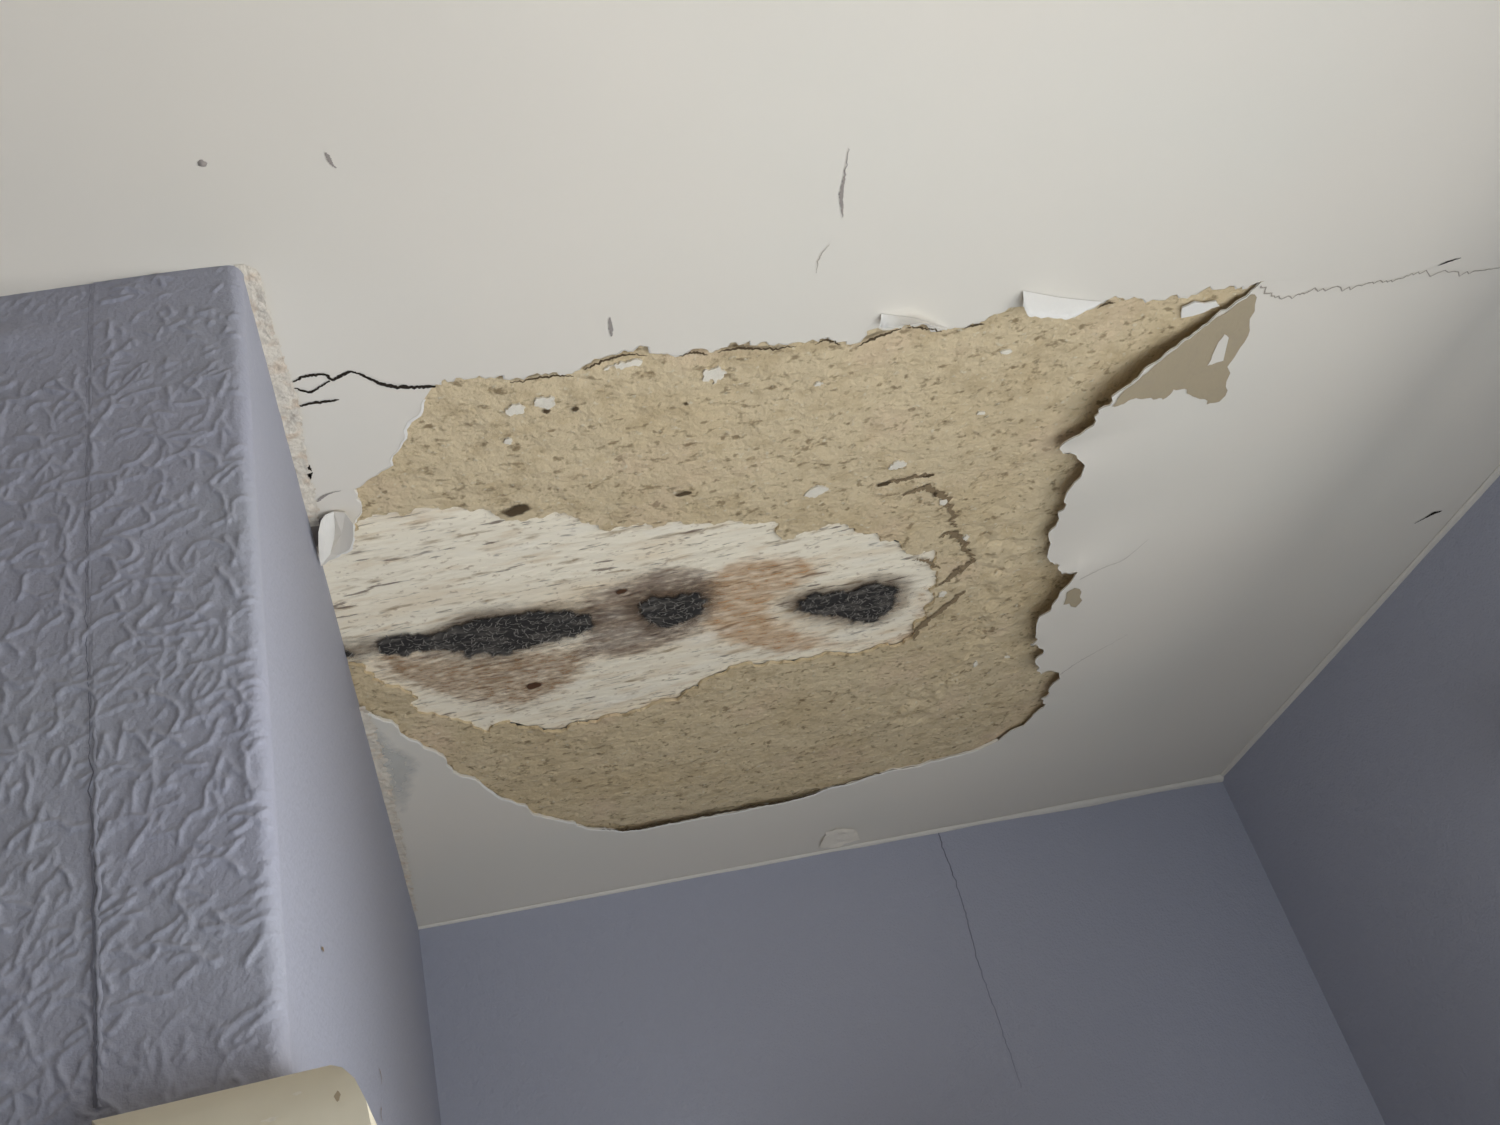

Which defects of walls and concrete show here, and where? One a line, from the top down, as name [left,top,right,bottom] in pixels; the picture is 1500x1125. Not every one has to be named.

crack [1260,267,1500,300]
crack [293,371,436,407]
flaking render [235,264,1264,911]
damp [792,581,903,627]
damp [378,570,710,704]